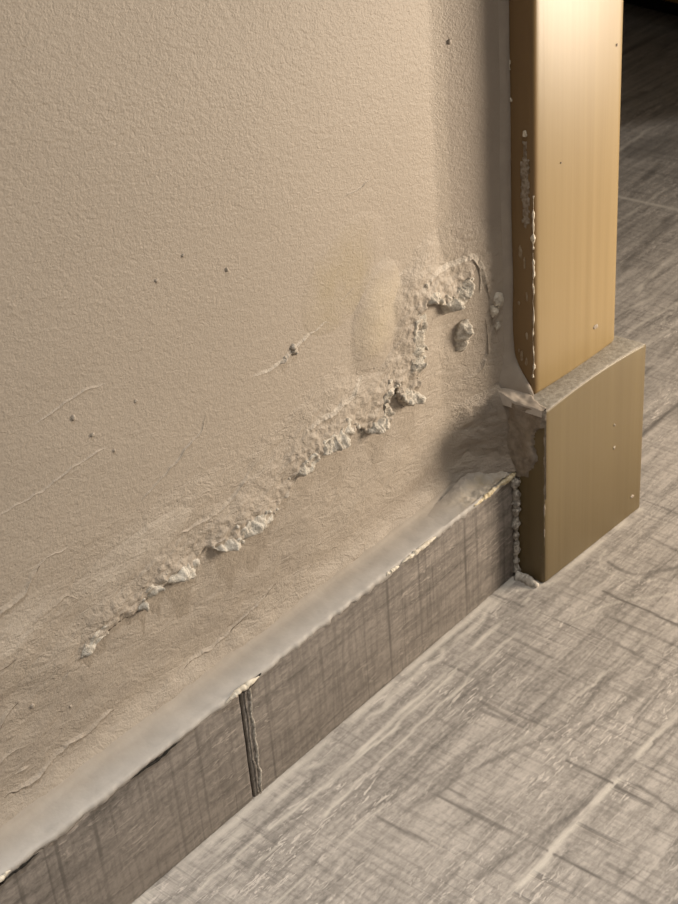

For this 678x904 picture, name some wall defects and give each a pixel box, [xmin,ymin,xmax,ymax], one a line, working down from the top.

peeling [75,209,504,663]